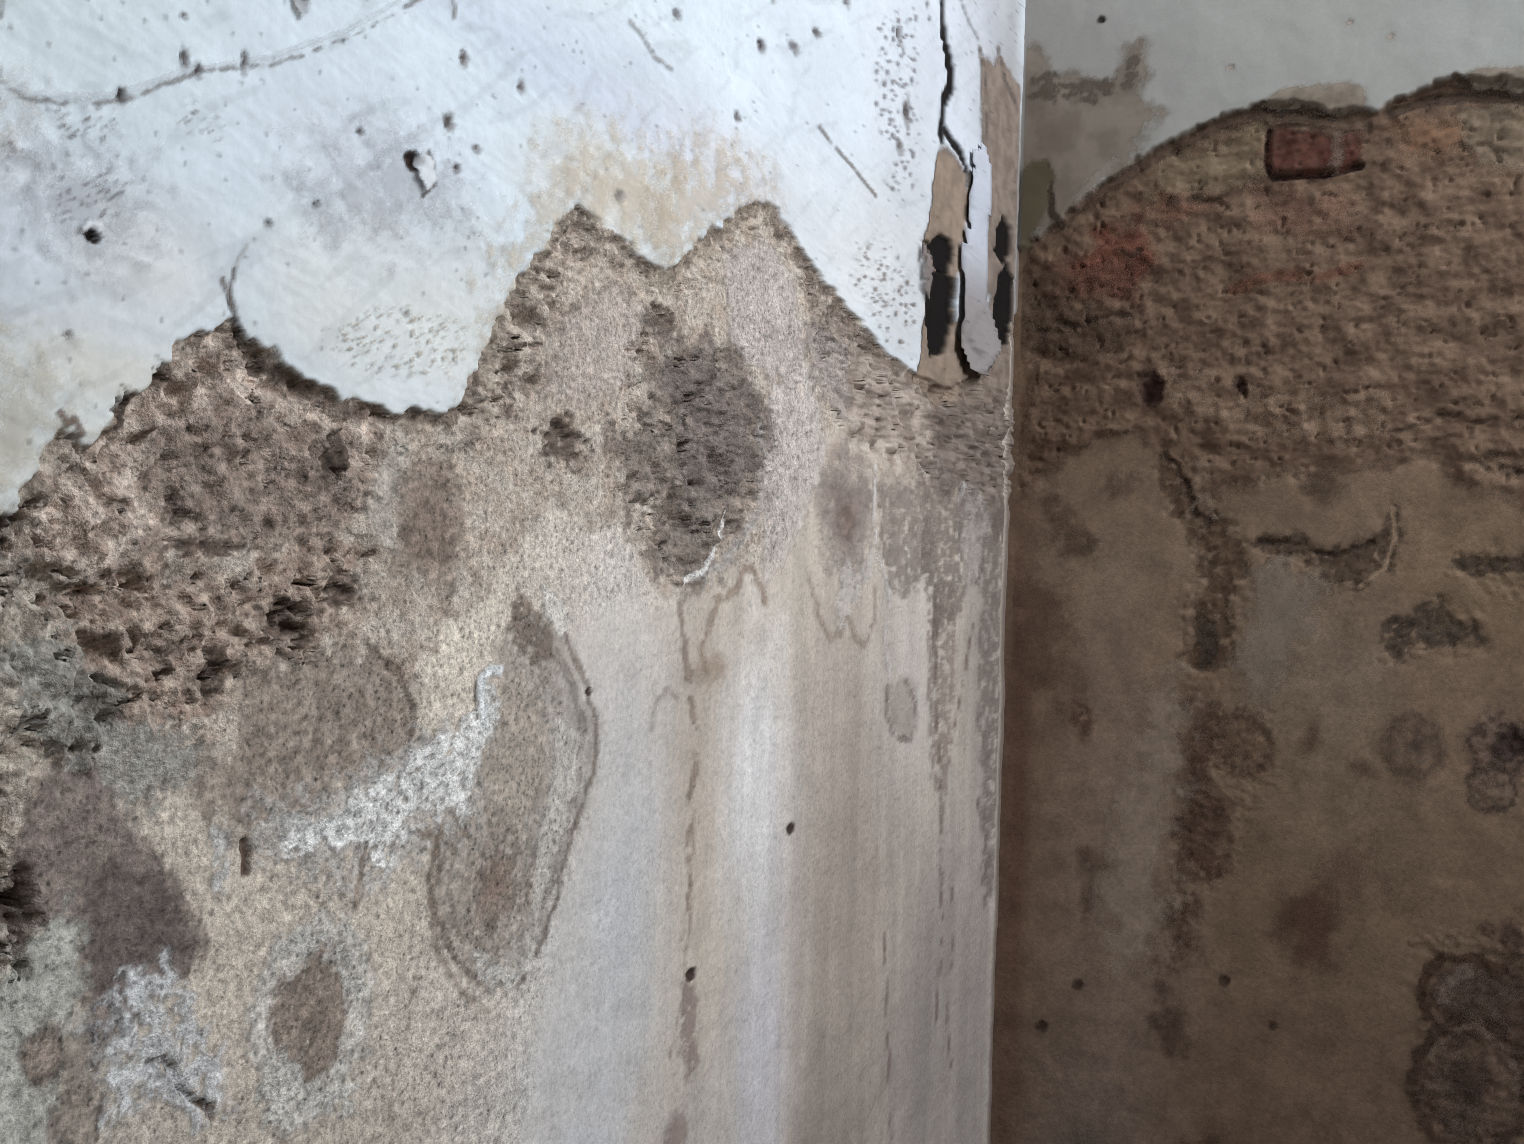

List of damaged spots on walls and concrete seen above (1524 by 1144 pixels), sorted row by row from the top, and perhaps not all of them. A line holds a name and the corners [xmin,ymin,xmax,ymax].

crack [14,41,336,104]
peeling [876,15,920,190]
crack [927,0,972,218]
spalling [1021,66,1524,672]
spalling [0,47,1021,1144]
damp [681,510,767,625]
damp [0,580,597,1144]
damp [1082,671,1276,972]
damp [1381,710,1447,787]
damp [1464,710,1524,813]
damp [1407,918,1524,1144]